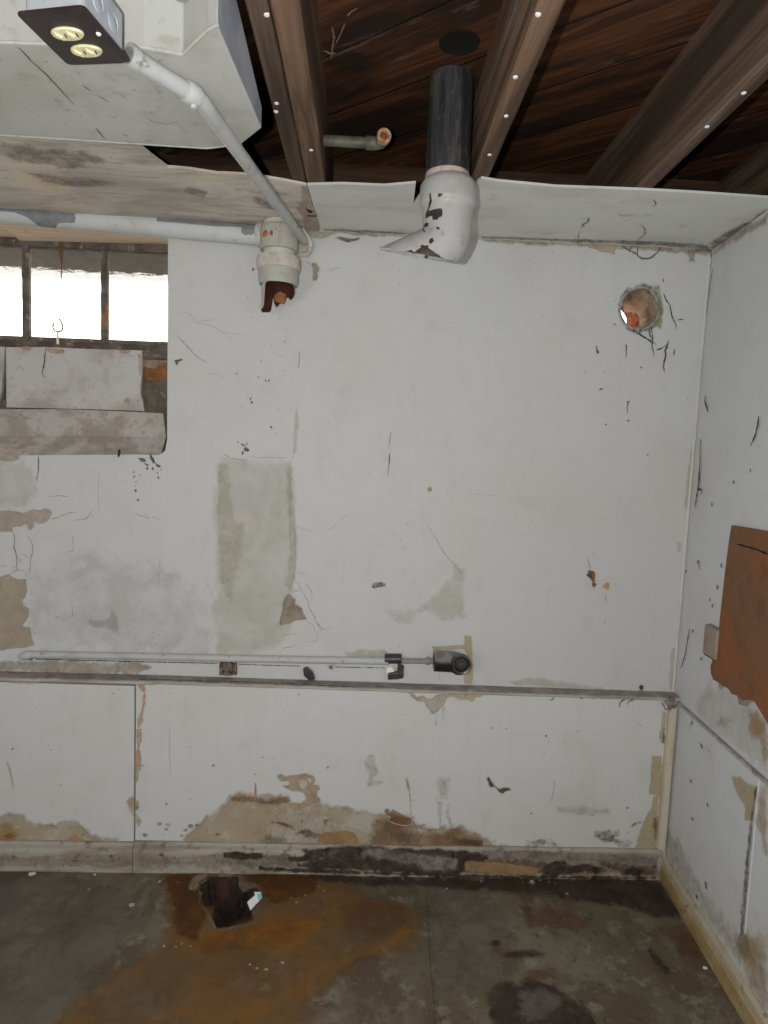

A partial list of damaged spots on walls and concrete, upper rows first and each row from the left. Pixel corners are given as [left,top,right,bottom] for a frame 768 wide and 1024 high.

peeling [0,508,52,533]
crack [224,454,353,650]
peeling [0,574,34,651]
spalling [280,593,307,625]
peeling [277,773,321,813]
leakage [0,814,102,841]
peeling [384,809,413,826]
leakage [186,756,700,1024]